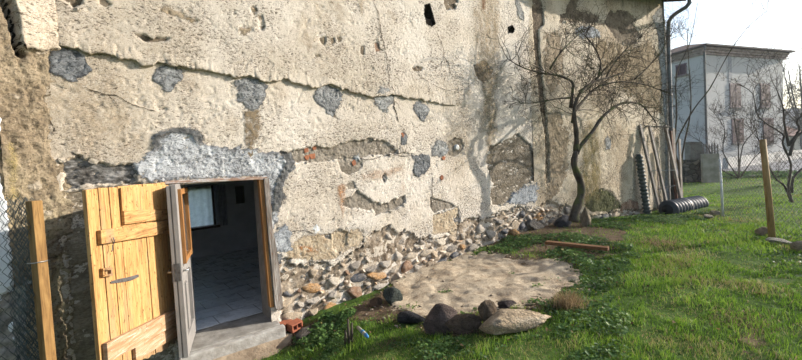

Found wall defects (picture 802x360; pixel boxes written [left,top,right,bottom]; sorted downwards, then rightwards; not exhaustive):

crack [374,0,399,122]
crack [84,87,154,111]
peeling [532,0,663,204]
spalling [486,134,534,206]
peeling [286,228,364,261]
peeling [430,197,460,237]